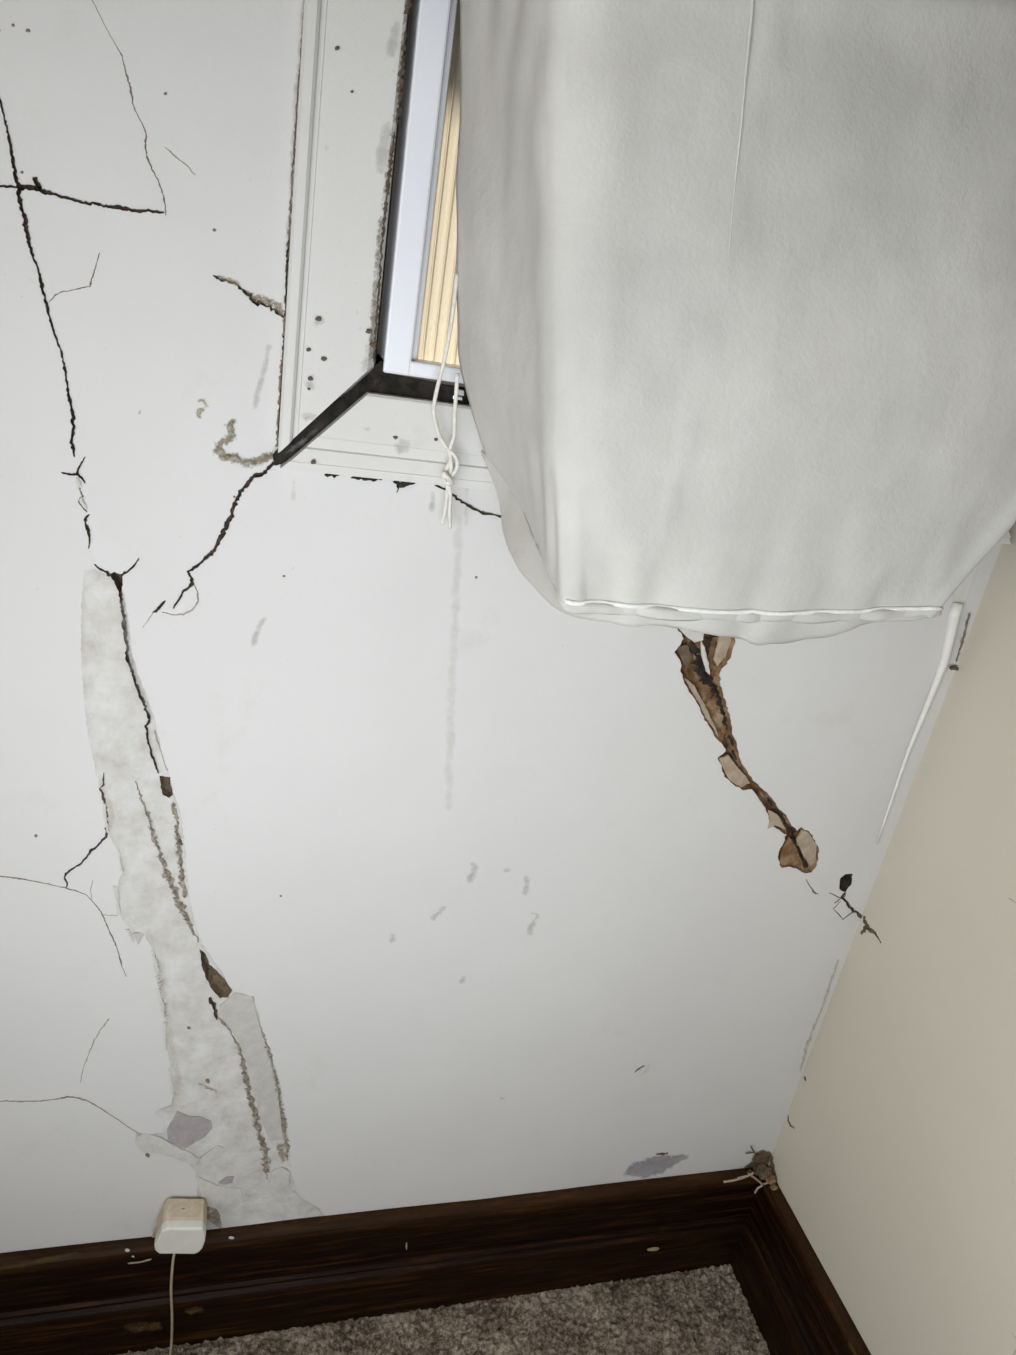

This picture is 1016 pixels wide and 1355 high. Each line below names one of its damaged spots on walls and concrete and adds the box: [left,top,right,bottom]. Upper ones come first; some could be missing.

crack [0,0,304,773]
crack [0,837,126,975]
peeling [81,569,324,1239]
crack [0,1018,139,1134]
spalling [723,1146,778,1194]